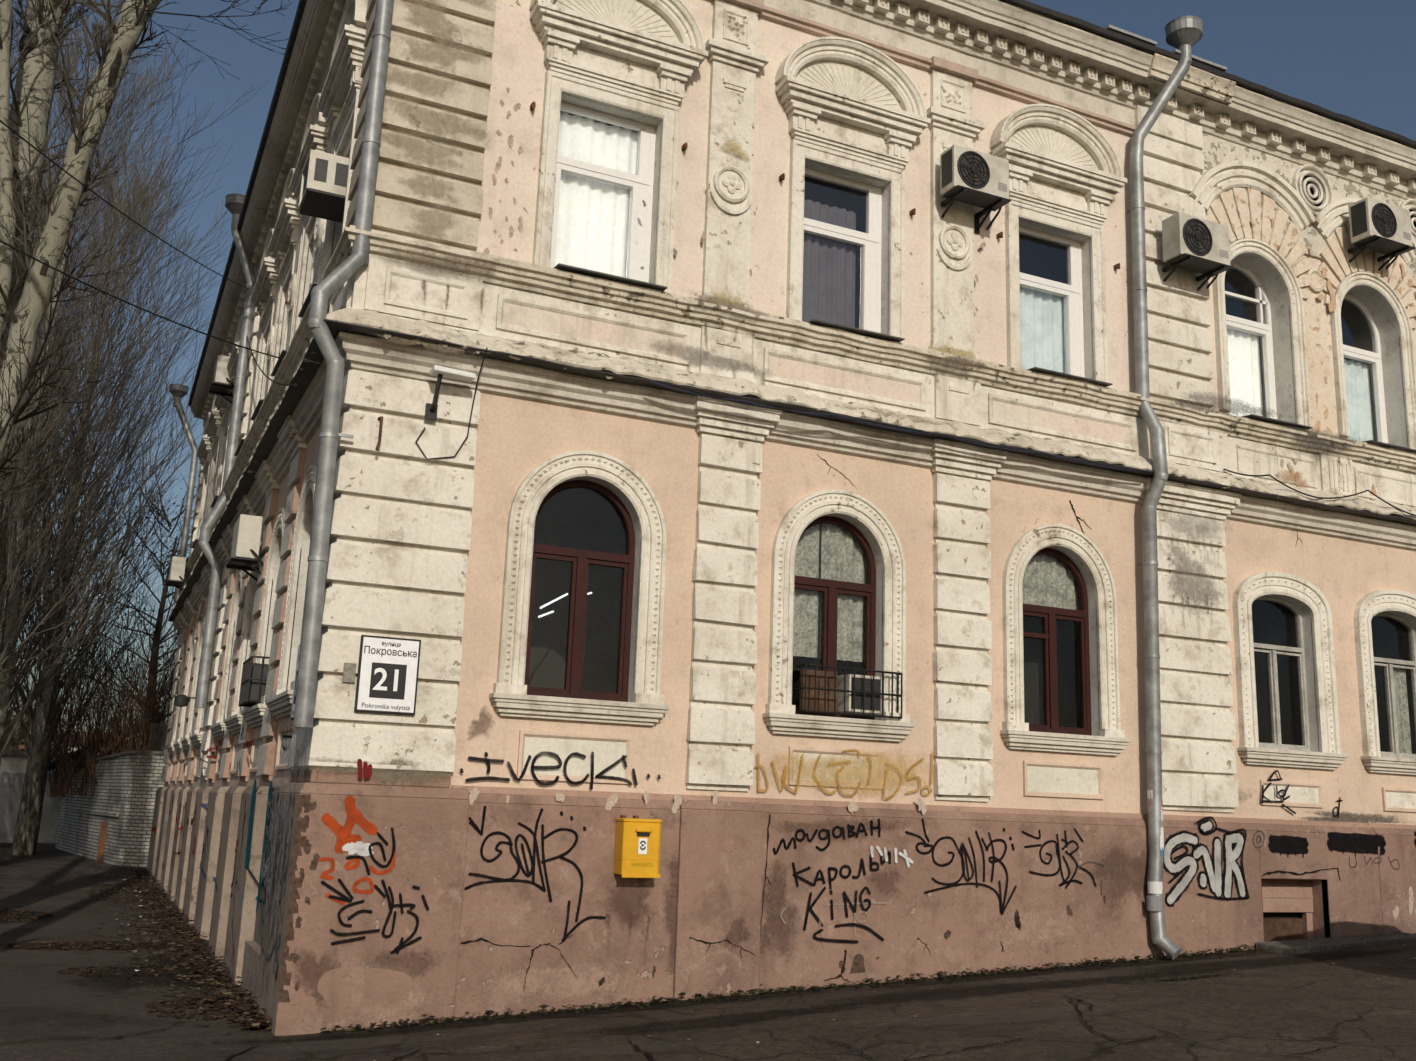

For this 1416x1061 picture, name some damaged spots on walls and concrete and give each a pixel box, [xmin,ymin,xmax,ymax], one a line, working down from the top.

peeling [484,88,523,254]
spalling [275,794,320,1002]
crack [461,935,577,991]